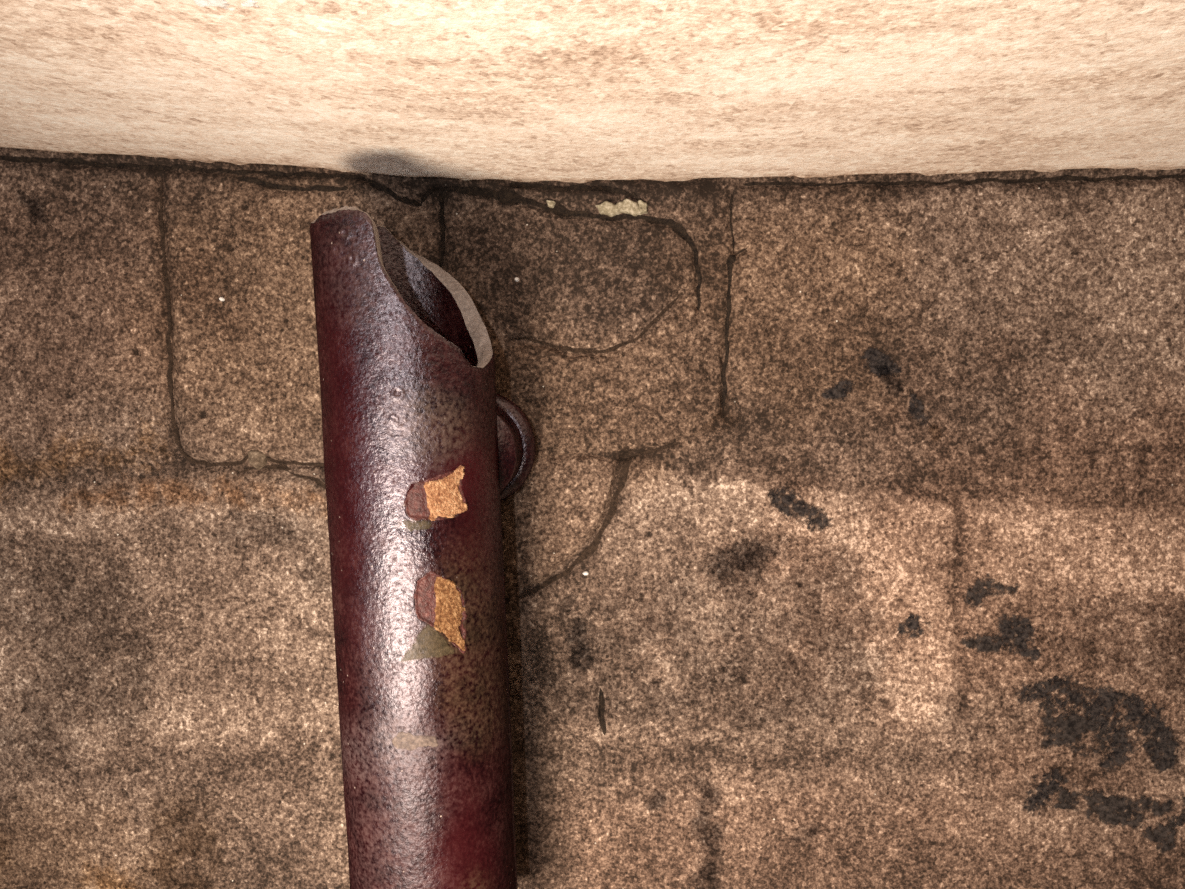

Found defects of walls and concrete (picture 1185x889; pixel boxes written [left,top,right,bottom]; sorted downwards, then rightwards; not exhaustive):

crack [0,156,1185,489]
water stain [861,348,901,377]
water stain [822,379,855,400]
water stain [907,394,929,425]
crack [519,442,679,598]
water stain [768,486,831,532]
water stain [964,572,1019,608]
water stain [897,613,930,638]
water stain [960,613,1040,661]
water stain [1022,768,1185,854]